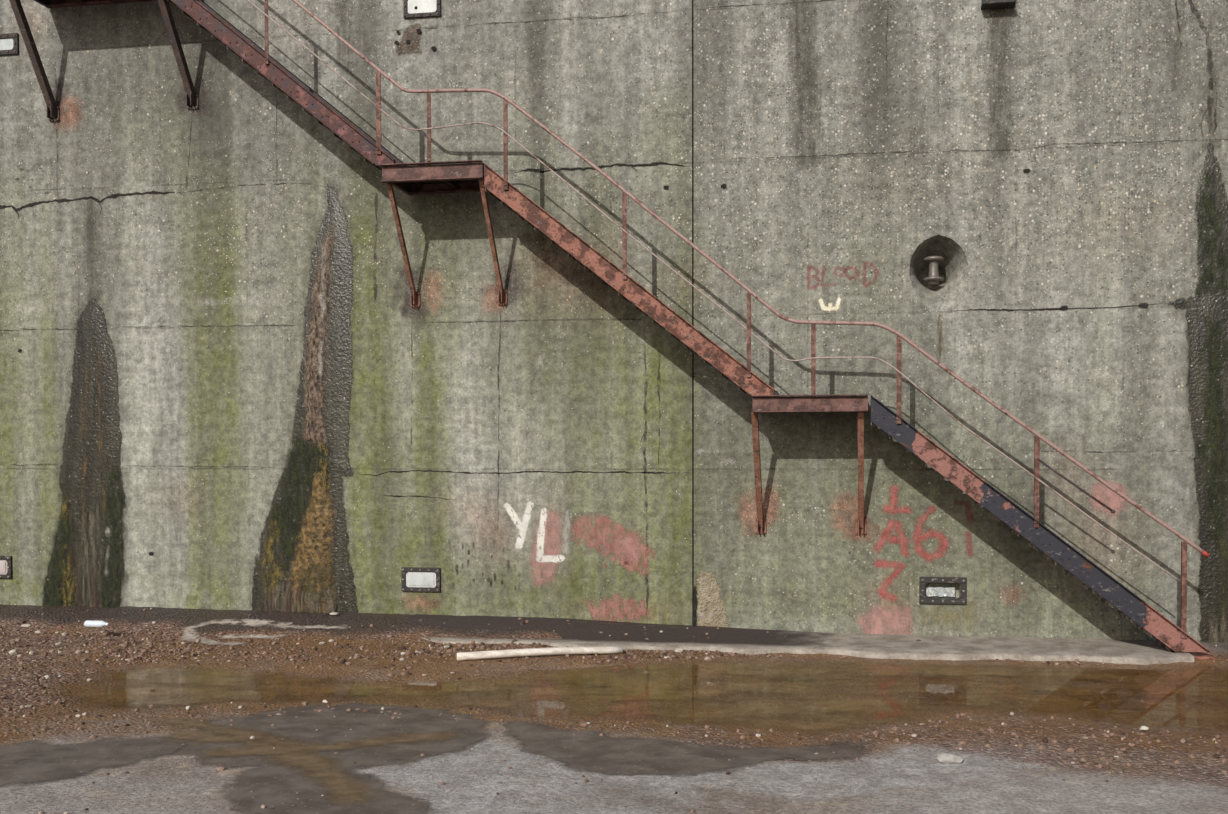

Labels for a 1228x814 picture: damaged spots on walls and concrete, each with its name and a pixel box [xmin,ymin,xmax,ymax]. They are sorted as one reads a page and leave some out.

spalling [394,24,436,55]
crack [953,0,1228,151]
crack [0,122,304,220]
crack [516,162,687,173]
crack [742,150,910,158]
crack [956,303,1162,311]
water stain [43,297,125,608]
water stain [181,184,358,645]
crack [358,315,688,617]
water stain [1169,129,1228,643]
spalling [692,572,729,627]